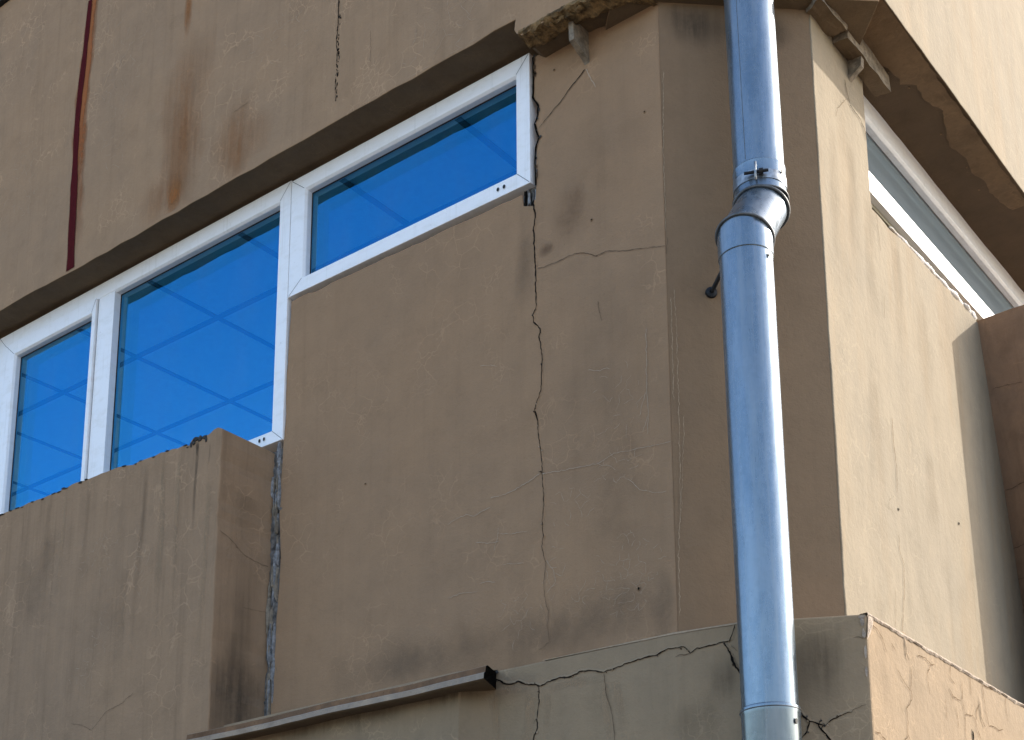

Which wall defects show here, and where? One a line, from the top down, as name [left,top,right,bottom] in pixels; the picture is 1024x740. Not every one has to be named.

corrosion [66,0,97,271]
crack [541,69,596,125]
spalling [518,0,657,206]
peeling [806,0,1024,210]
crack [449,200,670,650]
crack [497,625,740,740]
crack [801,705,863,740]
crack [854,545,1007,740]